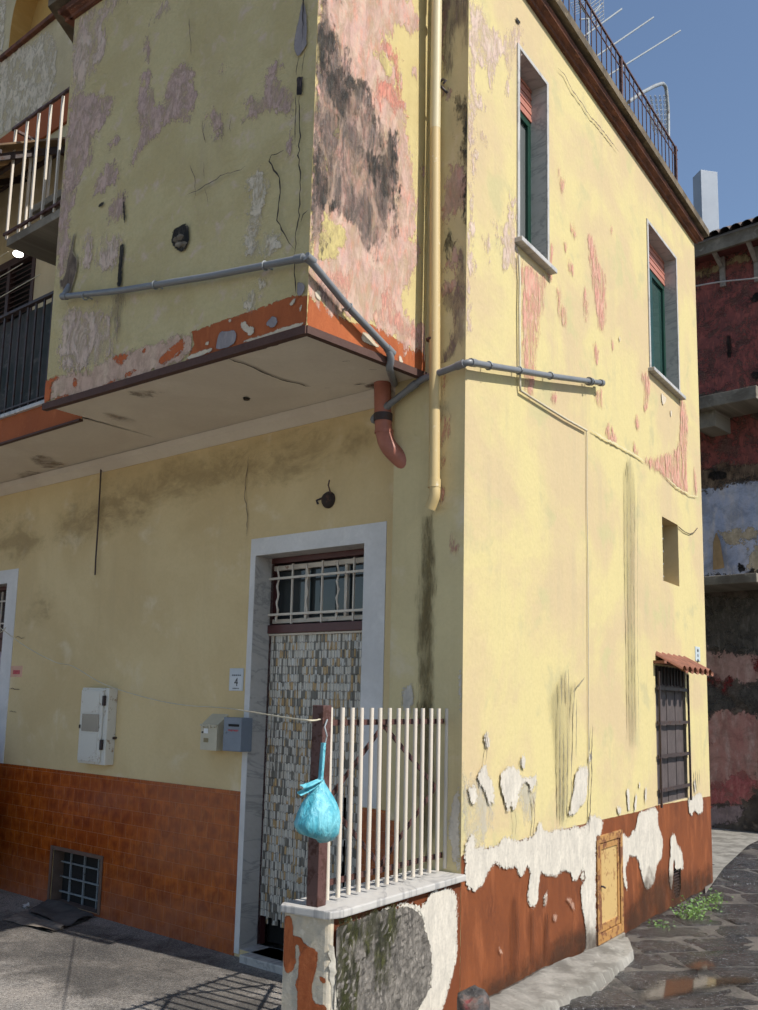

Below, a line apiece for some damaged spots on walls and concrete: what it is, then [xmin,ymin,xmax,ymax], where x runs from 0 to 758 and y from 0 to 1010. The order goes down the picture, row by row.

crack [268,96,308,291]
crack [296,0,305,71]
mould [310,0,402,262]
peeling [308,0,426,363]
peeling [441,0,567,395]
peeling [44,279,303,403]
crack [230,359,308,387]
damp [417,519,435,856]
flaking render [284,753,603,1010]
damp [559,669,585,822]
peeling [617,783,684,891]
flaking render [688,594,758,828]